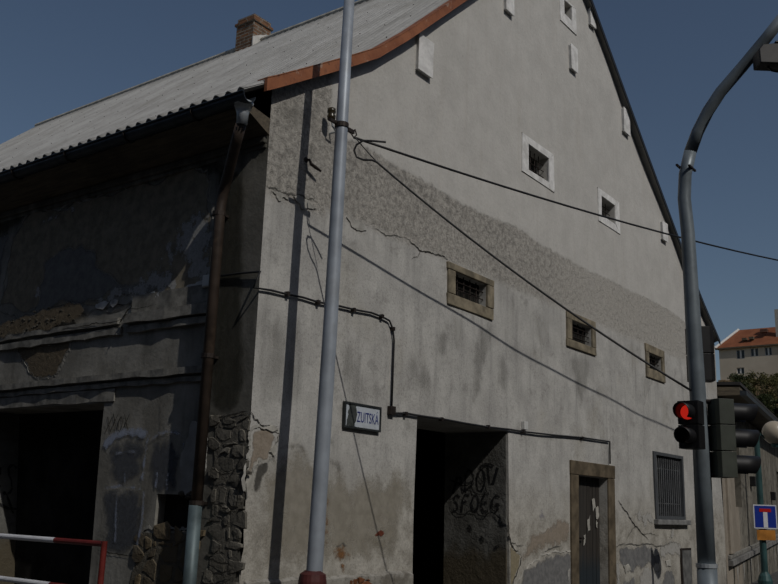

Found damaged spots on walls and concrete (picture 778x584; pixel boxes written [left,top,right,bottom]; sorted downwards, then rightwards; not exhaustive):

spalling [0,168,214,319]
crack [371,228,448,260]
spalling [16,341,72,381]
spalling [197,411,280,584]
spalling [107,521,187,584]
spalling [517,521,571,584]